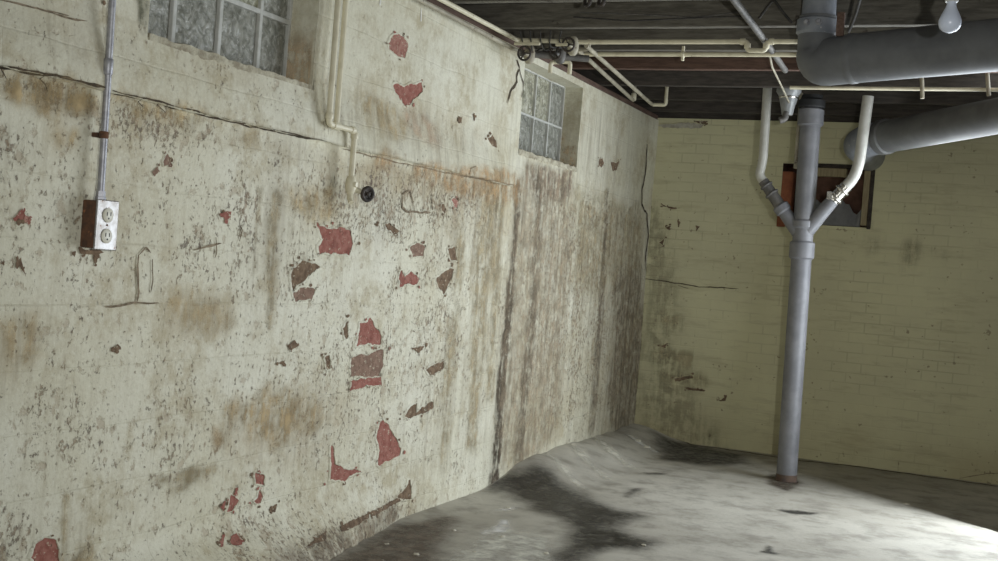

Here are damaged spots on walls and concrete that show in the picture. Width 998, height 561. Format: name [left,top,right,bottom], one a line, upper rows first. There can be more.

spalling [386,31,409,61]
crack [0,65,519,186]
spalling [391,79,425,108]
crack [642,151,737,289]
spalling [288,220,361,303]
spalling [321,353,332,376]
spalling [341,315,391,392]
leakage [467,168,650,561]
leakage [609,276,740,464]
spalling [324,443,362,486]
spalling [374,400,434,469]
spalling [26,534,63,561]